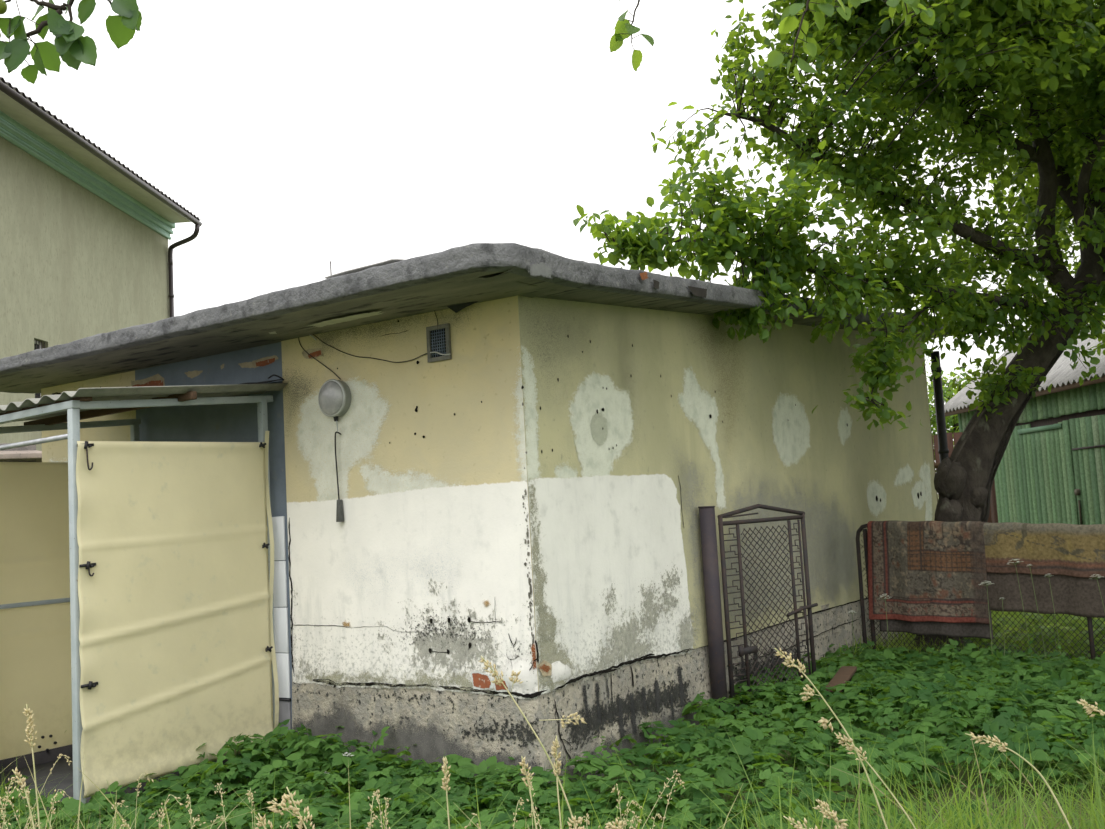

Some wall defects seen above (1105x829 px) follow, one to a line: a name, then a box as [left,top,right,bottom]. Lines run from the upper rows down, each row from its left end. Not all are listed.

water stain [292,686,540,793]
peeling [290,467,699,694]
crack [288,517,867,759]
water stain [559,443,710,788]
water stain [683,313,862,690]